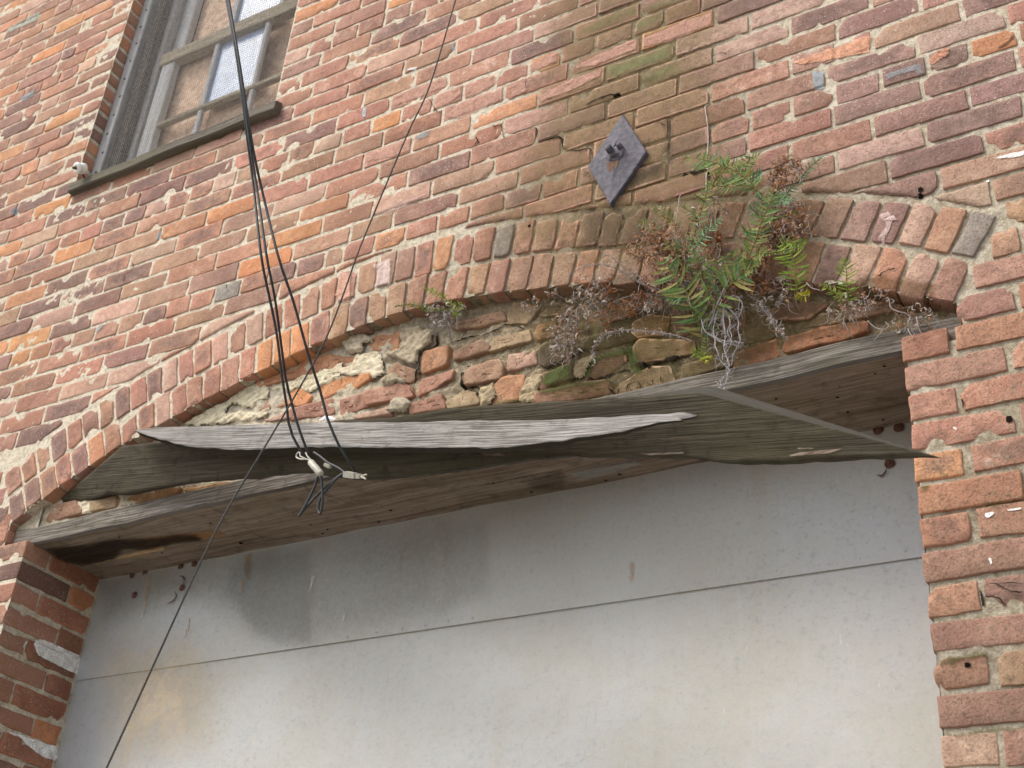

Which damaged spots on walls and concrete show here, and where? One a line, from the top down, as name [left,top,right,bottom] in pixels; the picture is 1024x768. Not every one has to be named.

crack [680,169,710,177]
crack [979,582,1022,606]